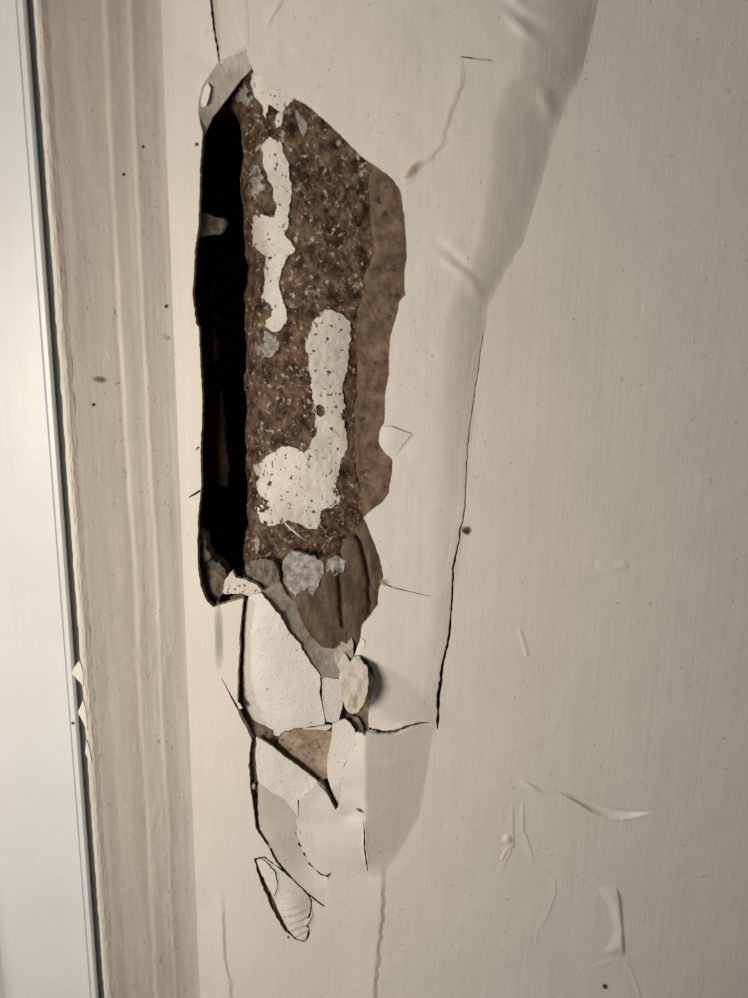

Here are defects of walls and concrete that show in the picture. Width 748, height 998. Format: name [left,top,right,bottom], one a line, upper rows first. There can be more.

crack [163,0,224,64]
spalling [188,50,411,940]
crack [369,333,489,737]
crack [324,822,387,998]